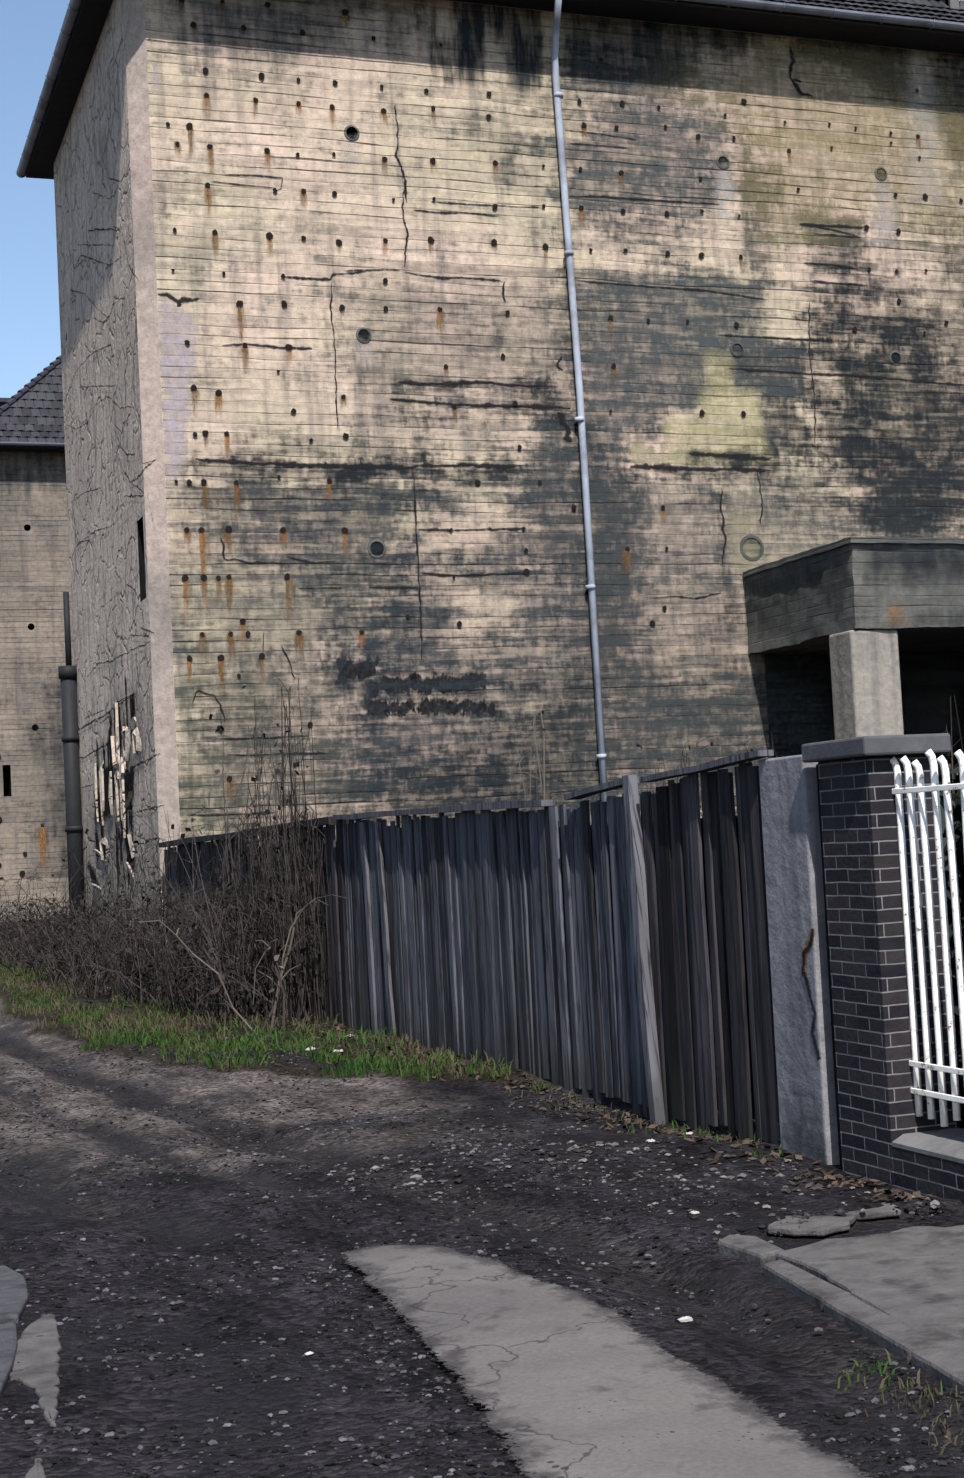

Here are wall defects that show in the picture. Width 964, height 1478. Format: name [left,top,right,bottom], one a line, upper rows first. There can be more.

corrosion [175,123,213,163]
crack [211,174,283,190]
crack [222,104,715,425]
crack [66,12,199,677]
corrosion [236,300,248,366]
corrosion [202,430,229,452]
leakage [178,0,964,827]
corrosion [182,527,232,601]
crack [195,457,523,660]
corrosion [217,618,246,677]
crack [78,693,160,788]
crack [192,690,326,756]